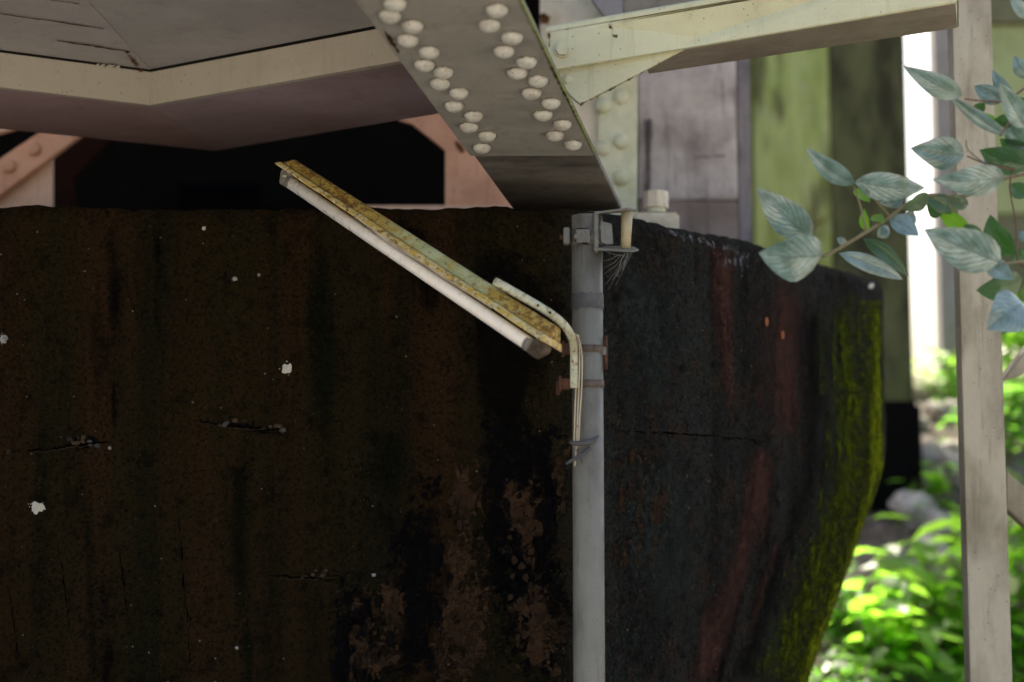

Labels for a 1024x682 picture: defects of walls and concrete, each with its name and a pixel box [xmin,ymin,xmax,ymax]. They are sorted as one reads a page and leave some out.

corrosion [771,282,798,431]